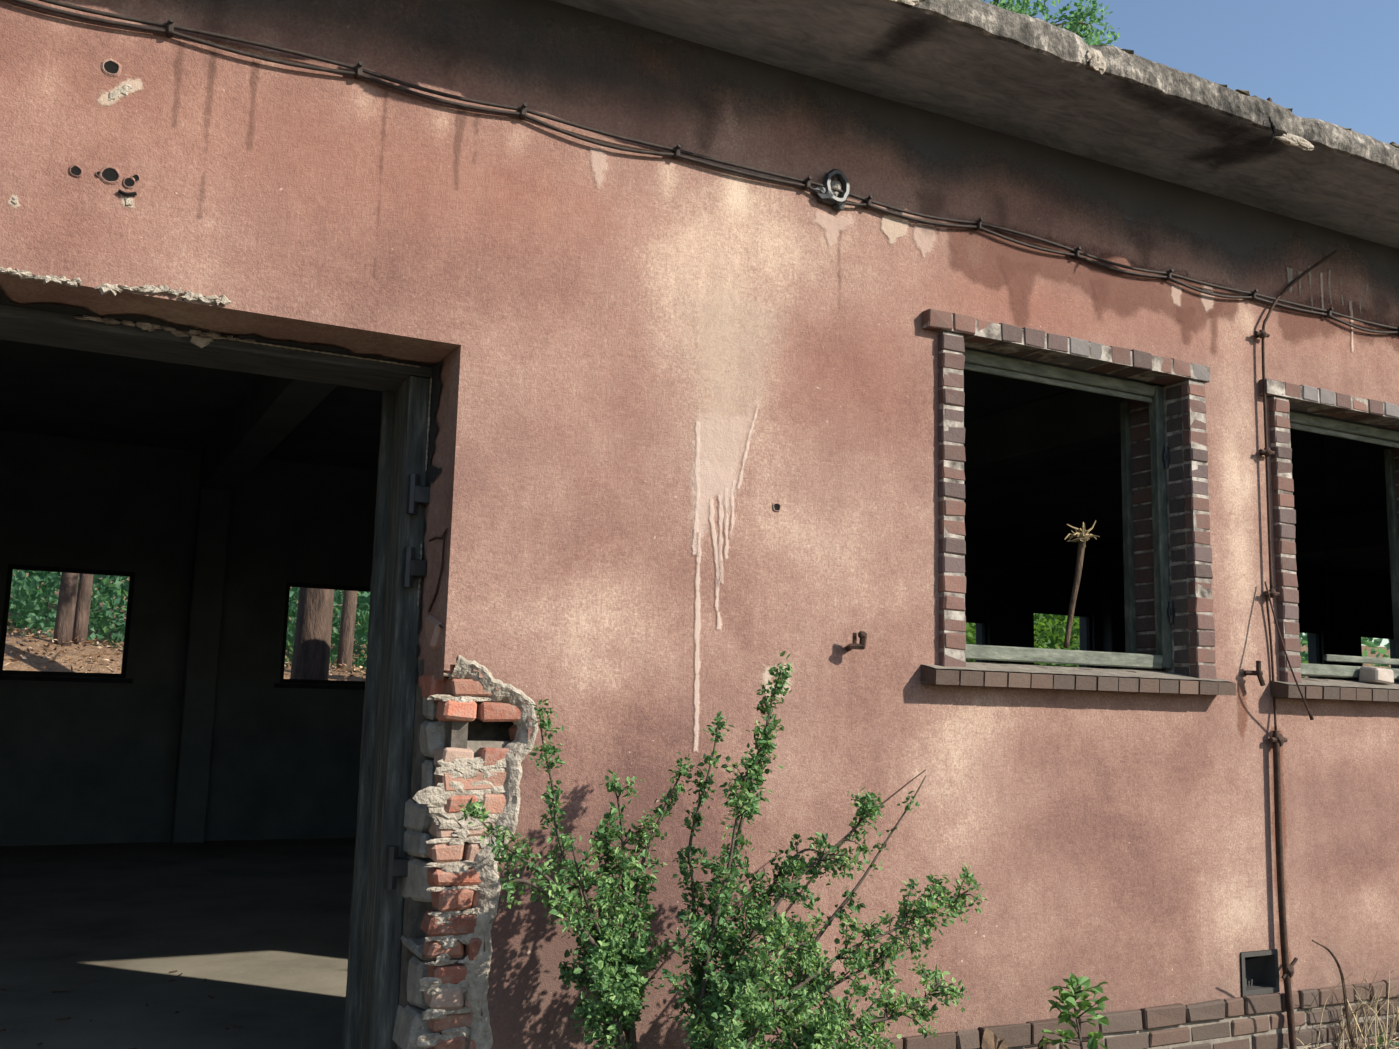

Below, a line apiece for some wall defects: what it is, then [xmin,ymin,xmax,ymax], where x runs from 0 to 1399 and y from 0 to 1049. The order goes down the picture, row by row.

spalling [0,267,231,308]
peeling [74,315,256,348]
damp [185,0,1399,351]
damp [693,410,757,751]
spalling [392,615,538,1049]